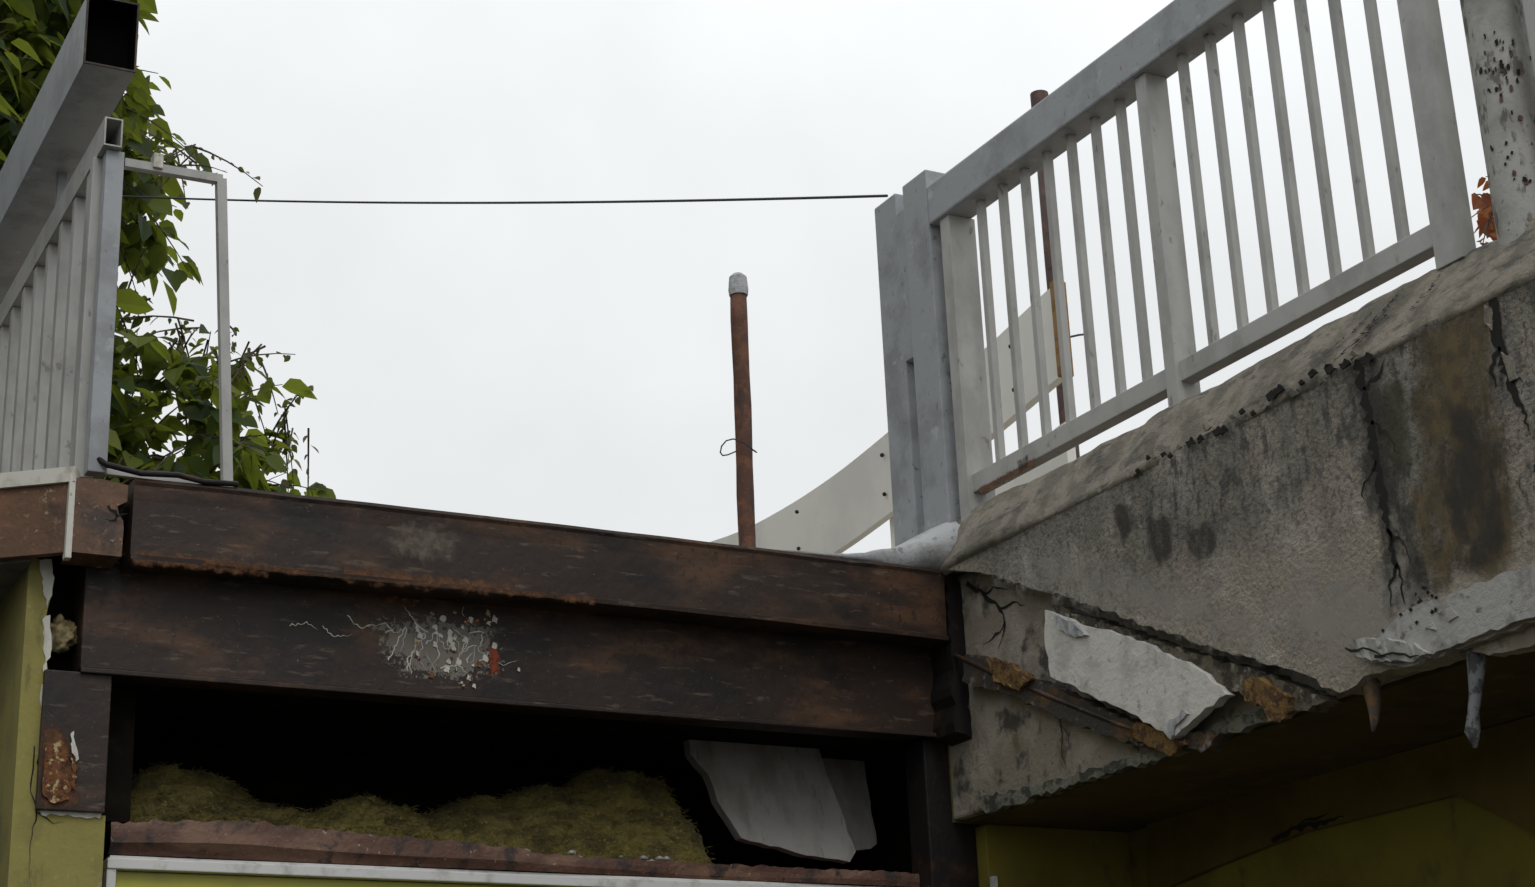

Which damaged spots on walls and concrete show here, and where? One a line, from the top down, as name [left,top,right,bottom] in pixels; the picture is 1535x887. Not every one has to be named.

crack [1483,297,1529,431]
crack [1321,267,1447,611]
leakage [1414,307,1512,585]
leakage [1114,505,1215,563]
crack [966,581,1024,648]
flaking render [1345,586,1459,662]
spalling [1471,624,1535,657]
spalling [953,604,1344,814]
corrosion [41,727,79,807]